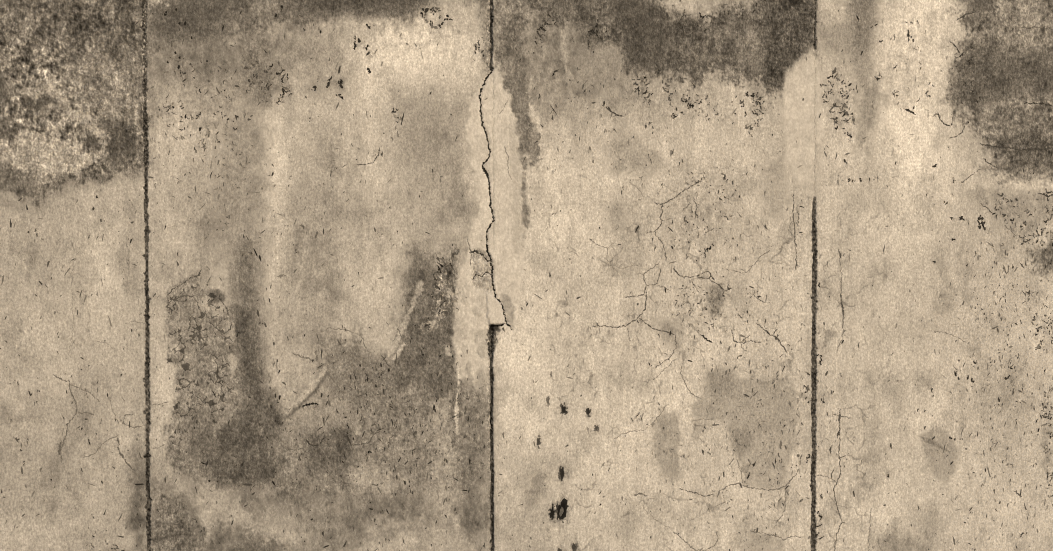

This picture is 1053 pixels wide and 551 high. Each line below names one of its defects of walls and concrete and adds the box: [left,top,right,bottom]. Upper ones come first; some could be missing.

damp [0,72,161,215]
crack [467,70,512,357]
damp [133,0,891,551]
crack [589,173,787,421]
spalling [526,62,866,551]
crack [788,50,816,266]
damp [934,0,1053,284]
crack [634,492,719,551]
crack [679,409,872,551]